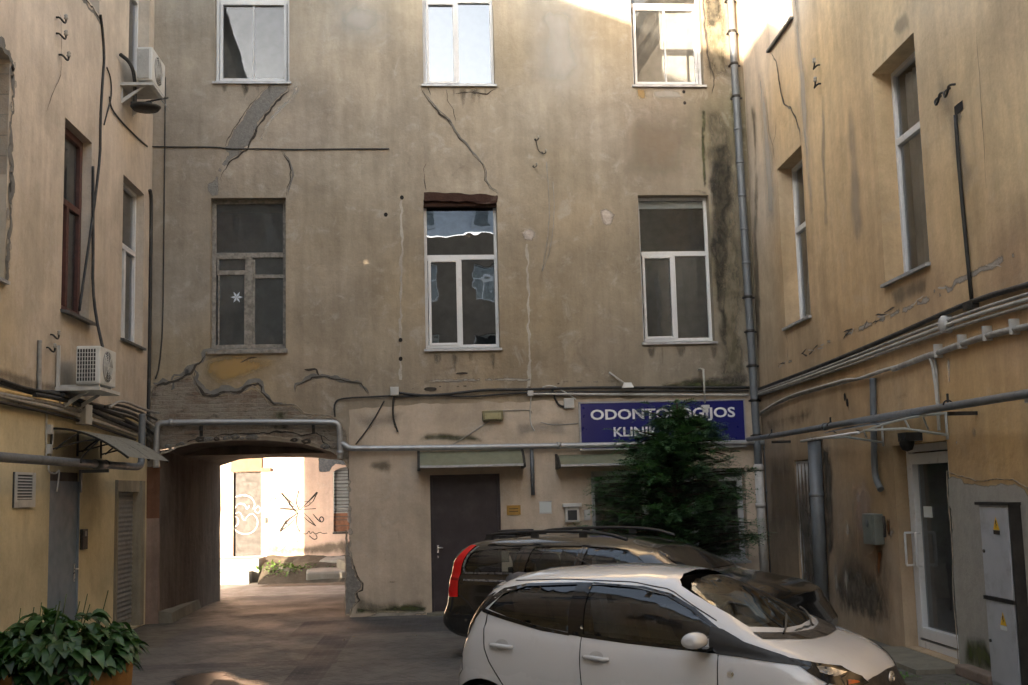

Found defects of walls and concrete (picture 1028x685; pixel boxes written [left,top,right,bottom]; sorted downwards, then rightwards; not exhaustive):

water stain [706,0,726,75]
crack [282,152,294,195]
crack [421,86,497,193]
crack [765,55,801,158]
water stain [671,114,746,393]
spalling [843,254,1014,339]
spalling [147,358,349,465]
crack [186,430,331,448]
crack [153,348,369,405]
spalling [344,480,364,616]